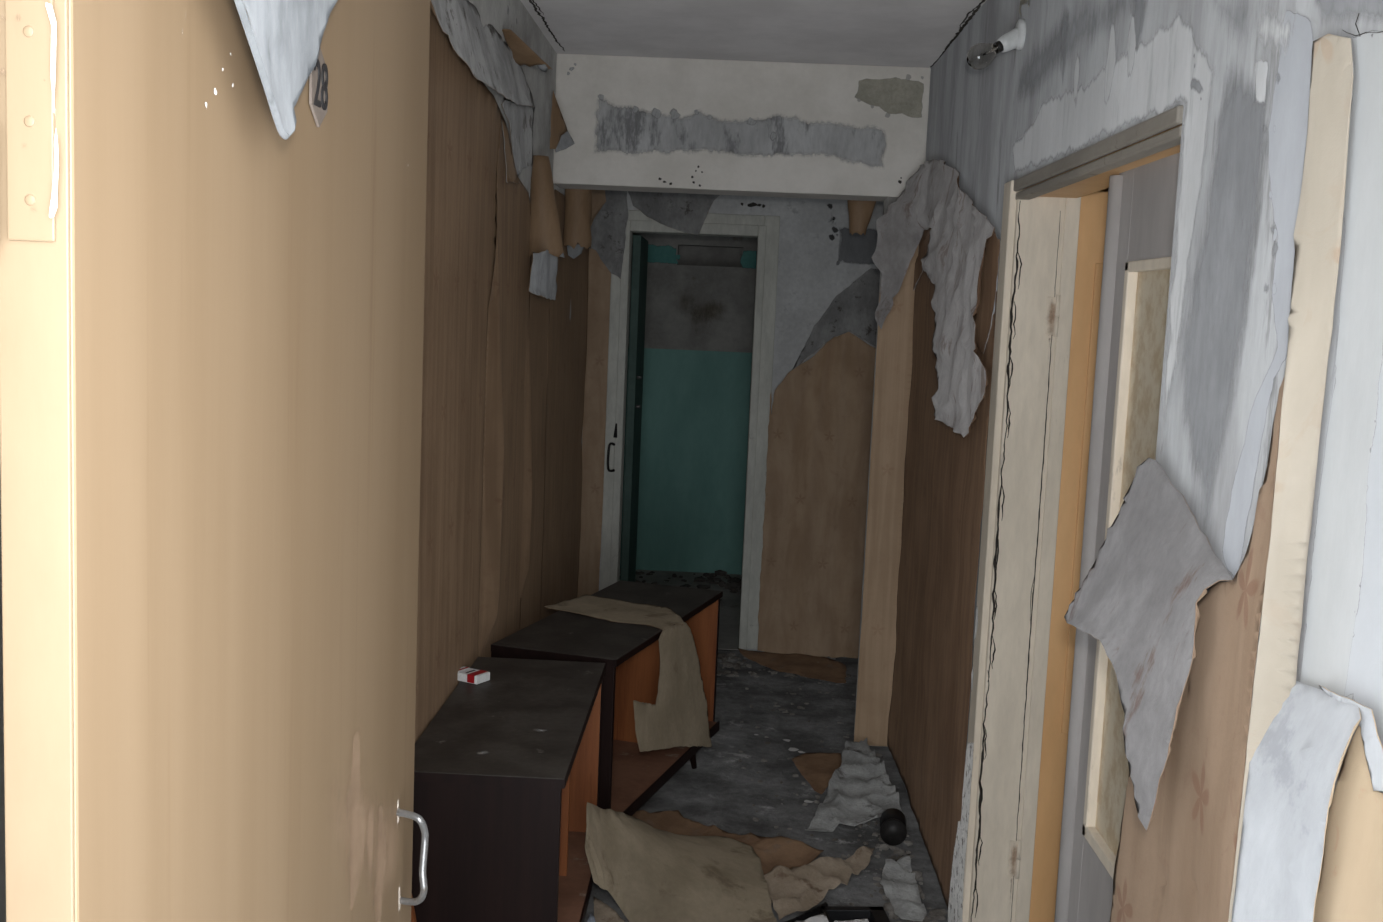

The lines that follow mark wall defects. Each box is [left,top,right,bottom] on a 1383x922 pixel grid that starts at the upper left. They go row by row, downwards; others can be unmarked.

peeling [1134,0,1145,51]
peeling [596,74,924,187]
peeling [741,251,757,269]
peeling [836,228,878,265]
peeling [1185,11,1313,577]
peeling [948,743,974,922]